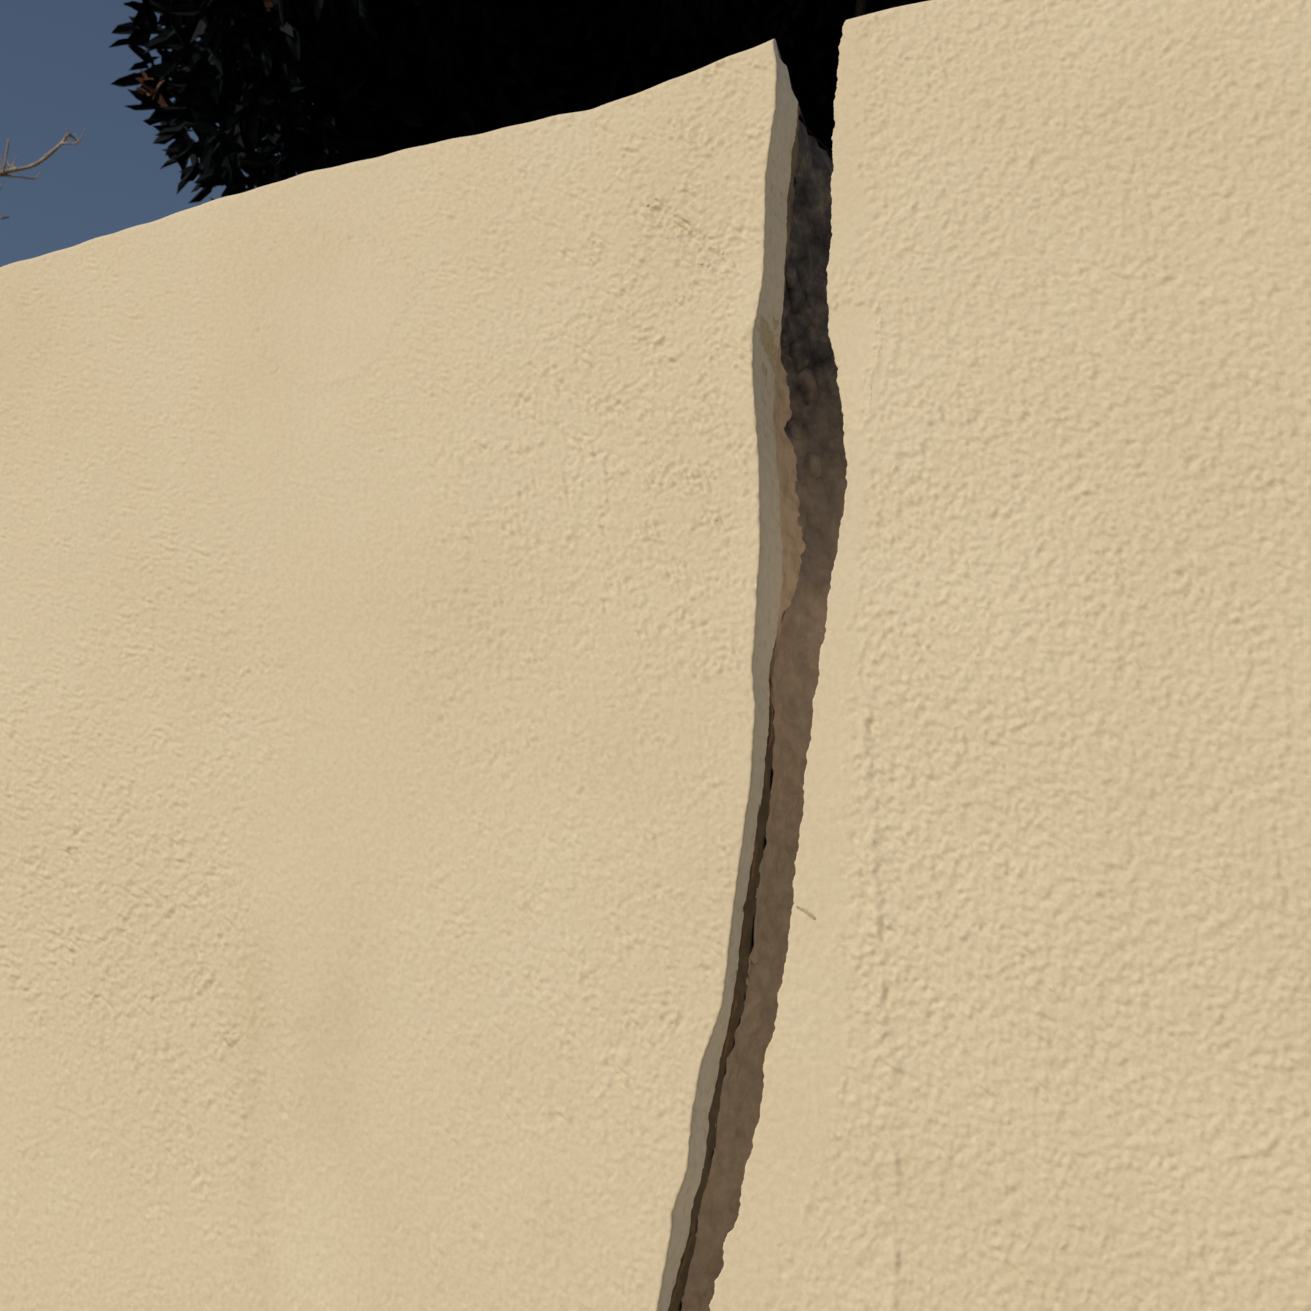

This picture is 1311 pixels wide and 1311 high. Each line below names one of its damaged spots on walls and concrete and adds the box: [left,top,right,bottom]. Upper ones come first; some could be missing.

crack [658,39,848,1311]